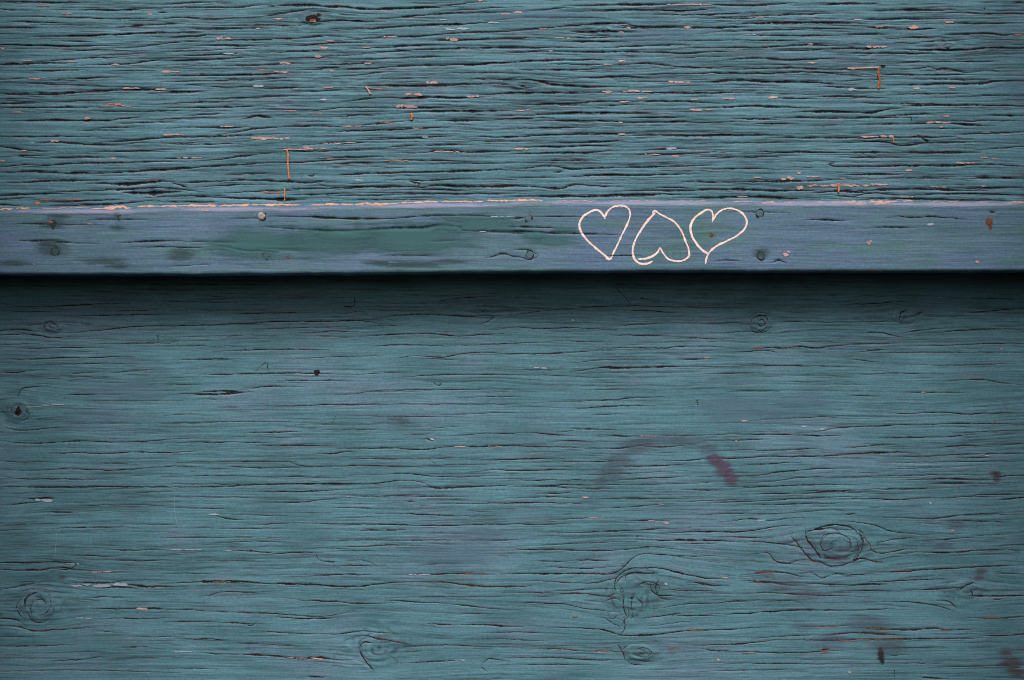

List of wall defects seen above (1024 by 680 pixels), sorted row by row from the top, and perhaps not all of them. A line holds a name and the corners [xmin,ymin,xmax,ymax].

peeling [395,81,438,108]
peeling [0,191,298,211]
peeling [781,172,888,202]
peeling [835,196,913,205]
crack [0,289,1024,679]
water stain [708,454,739,485]